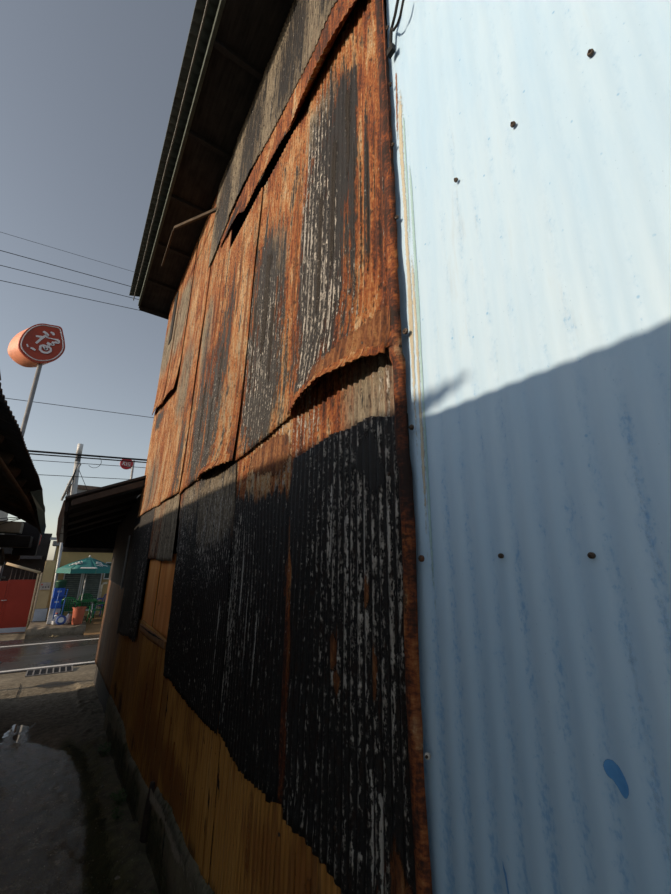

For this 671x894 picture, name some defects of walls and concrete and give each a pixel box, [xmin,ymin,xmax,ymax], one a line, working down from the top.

rust [395,74,426,505]
rust [248,433,292,479]
peeling [212,555,257,683]
peeling [369,769,384,894]